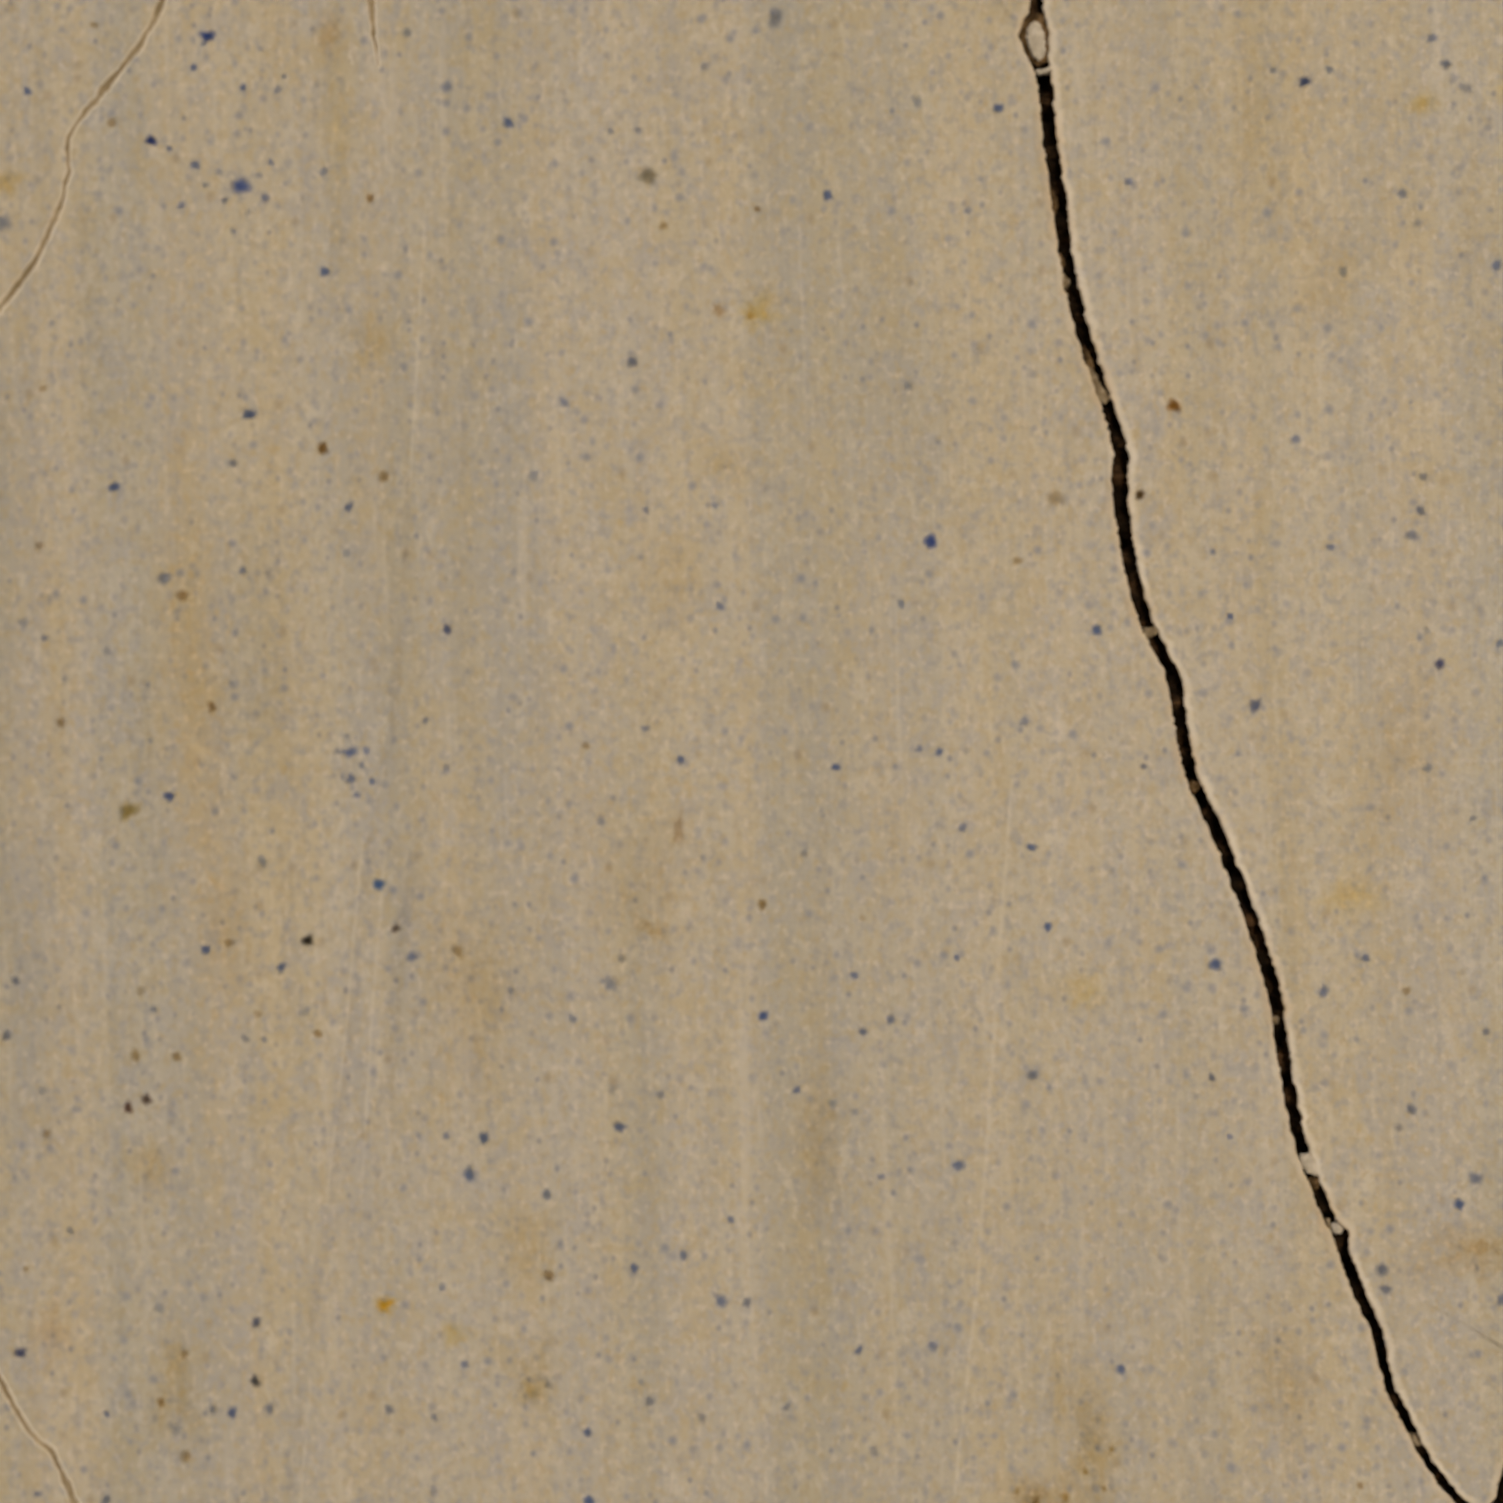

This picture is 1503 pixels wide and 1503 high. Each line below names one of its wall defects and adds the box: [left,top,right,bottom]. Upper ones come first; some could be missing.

crack [0,0,168,317]
crack [1011,0,1503,1503]
crack [0,1369,82,1503]